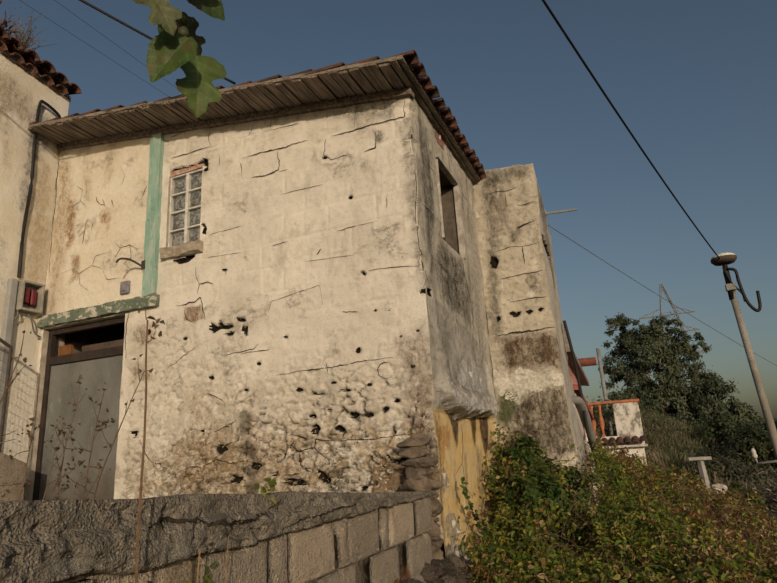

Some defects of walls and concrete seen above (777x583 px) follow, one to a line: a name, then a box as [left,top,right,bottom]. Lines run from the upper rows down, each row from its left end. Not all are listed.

crack [240,101,405,178]
crack [49,154,135,290]
crack [176,252,241,322]
crack [368,148,555,386]
crack [280,357,393,379]
damp [504,334,558,368]
damp [448,415,458,444]
damp [509,388,575,454]
hole [269,471,306,487]
damp [471,416,488,514]
peeling [445,512,473,565]